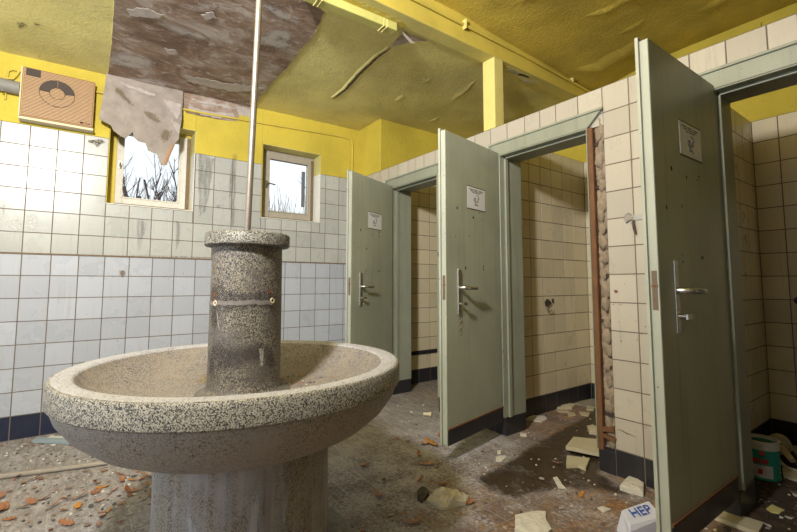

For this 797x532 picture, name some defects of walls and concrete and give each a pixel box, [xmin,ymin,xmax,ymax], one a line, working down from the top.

peeling [99,0,325,165]
peeling [343,0,407,28]
spalling [594,118,617,449]
water stain [481,409,626,496]